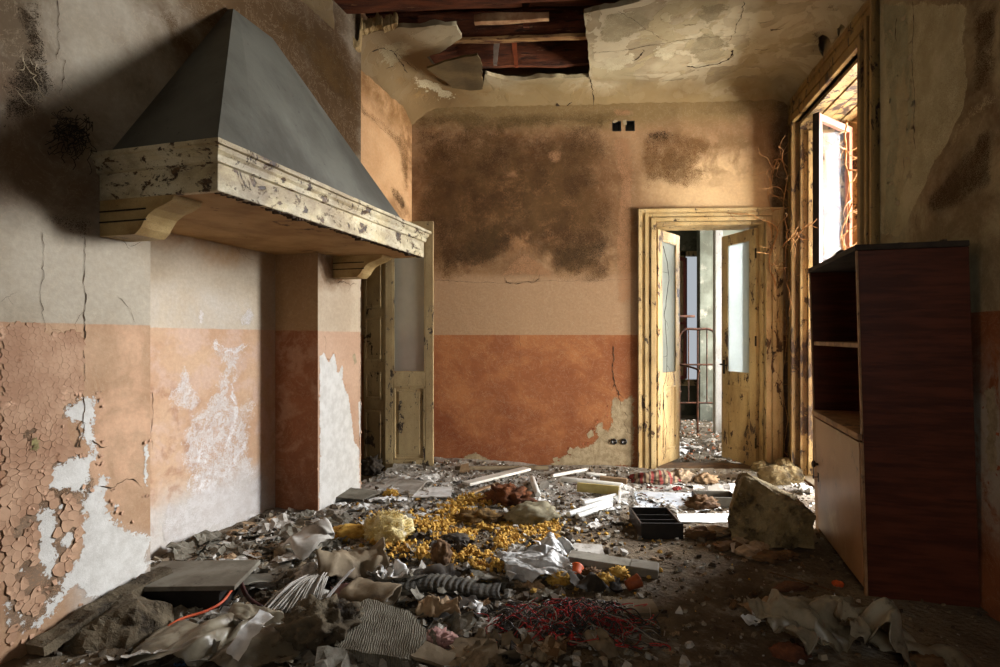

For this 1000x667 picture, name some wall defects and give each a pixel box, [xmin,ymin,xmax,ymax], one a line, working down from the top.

leakage [2,3,55,127]
peeling [415,77,456,101]
leakage [266,10,623,284]
leakage [640,129,720,188]
crack [599,3,780,81]
crack [40,233,107,448]
peeling [0,321,152,646]
leakage [161,339,269,547]
peeling [317,351,362,510]
flaking render [551,393,638,467]
crack [612,346,631,434]